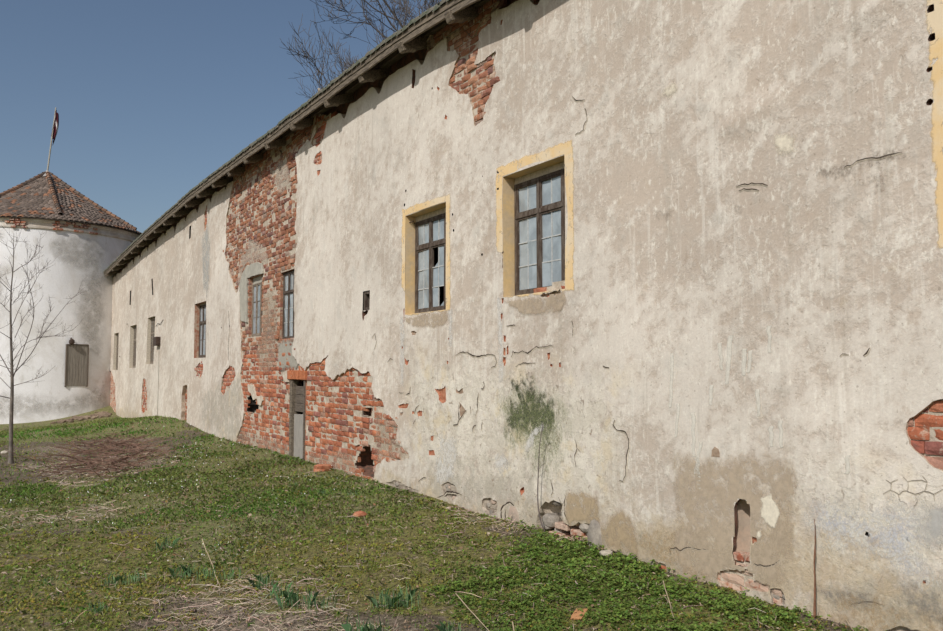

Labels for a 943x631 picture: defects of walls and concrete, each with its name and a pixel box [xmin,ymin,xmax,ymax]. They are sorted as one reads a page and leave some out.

flaking render [426,0,507,126]
crack [572,96,588,136]
crack [736,182,768,192]
crack [844,152,902,169]
flaking render [221,111,422,480]
crack [453,321,574,433]
crack [612,420,630,483]
flaking render [906,399,943,471]
crack [883,476,943,507]
flaking render [716,494,785,606]